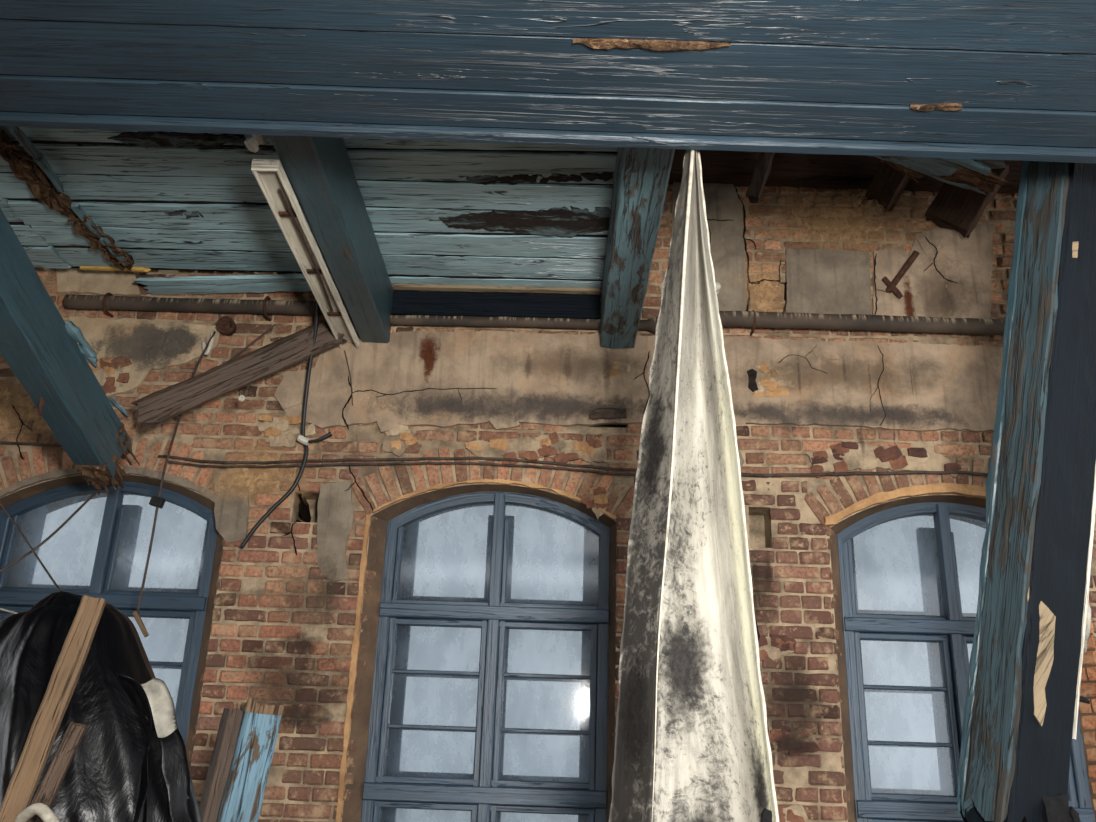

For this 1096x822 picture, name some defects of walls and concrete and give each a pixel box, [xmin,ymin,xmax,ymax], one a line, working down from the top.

crack [874,254,888,315]
crack [924,236,958,283]
damp [98,324,201,370]
crack [342,376,497,430]
crack [869,346,886,426]
spalling [580,486,609,520]